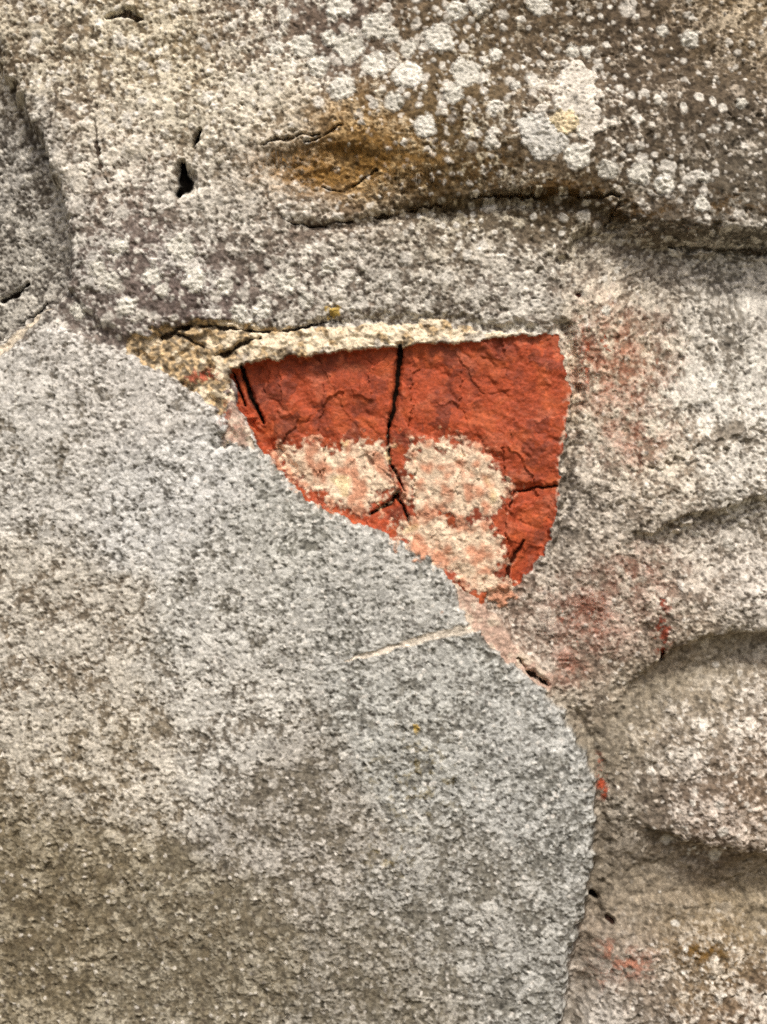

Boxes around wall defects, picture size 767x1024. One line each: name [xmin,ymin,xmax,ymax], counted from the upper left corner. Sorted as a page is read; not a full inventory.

crack [263,124,342,146]
crack [322,169,378,193]
crack [370,344,409,521]
crack [509,485,558,507]
spalling [271,434,518,608]
crack [506,540,524,579]